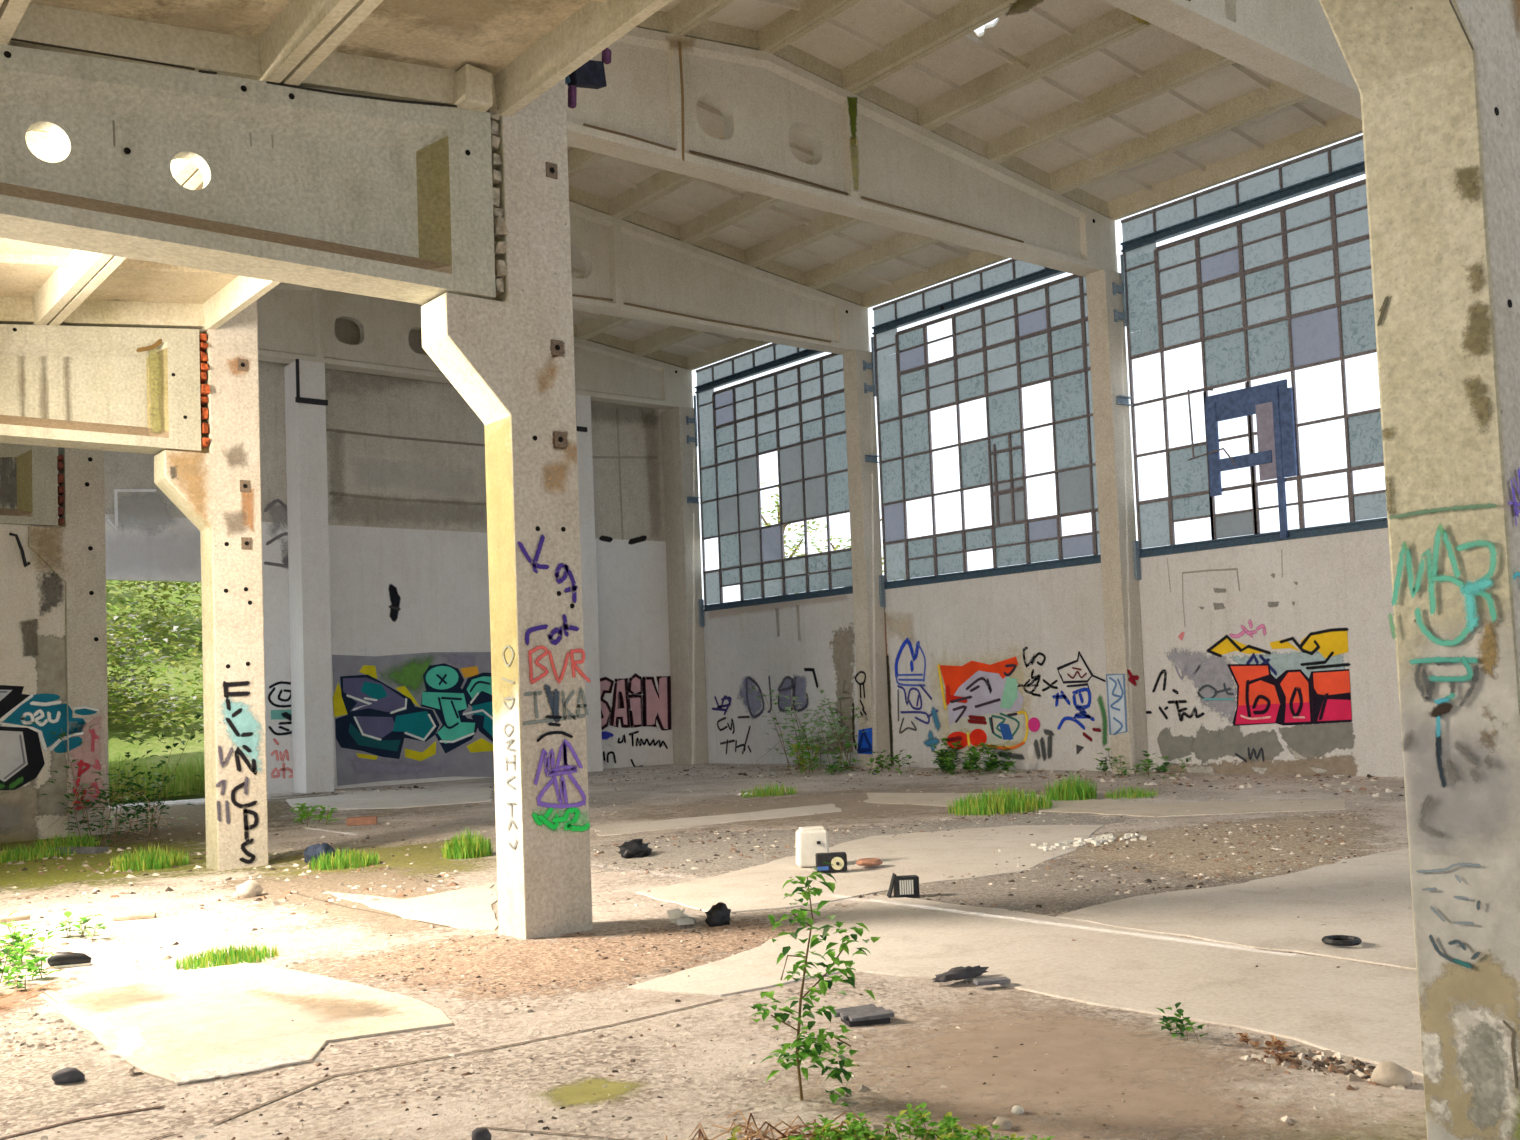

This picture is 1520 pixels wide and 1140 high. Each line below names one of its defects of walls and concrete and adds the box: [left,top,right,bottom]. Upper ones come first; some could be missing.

rust [546,431,577,487]
spalling [1419,954,1520,1140]